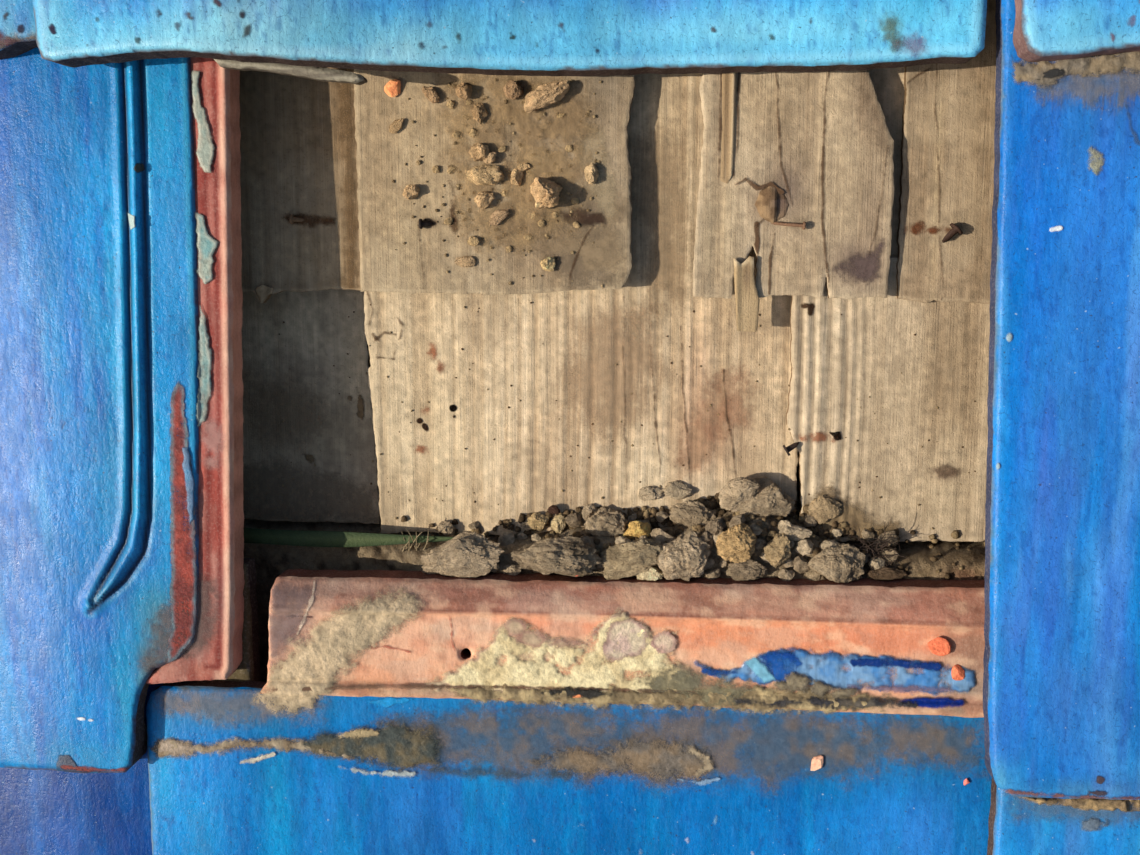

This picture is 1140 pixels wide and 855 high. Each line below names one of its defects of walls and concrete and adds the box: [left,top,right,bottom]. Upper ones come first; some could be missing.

peeling [195,212,218,284]
damp [834,242,884,282]
peeling [197,307,212,426]
peeling [927,637,965,680]